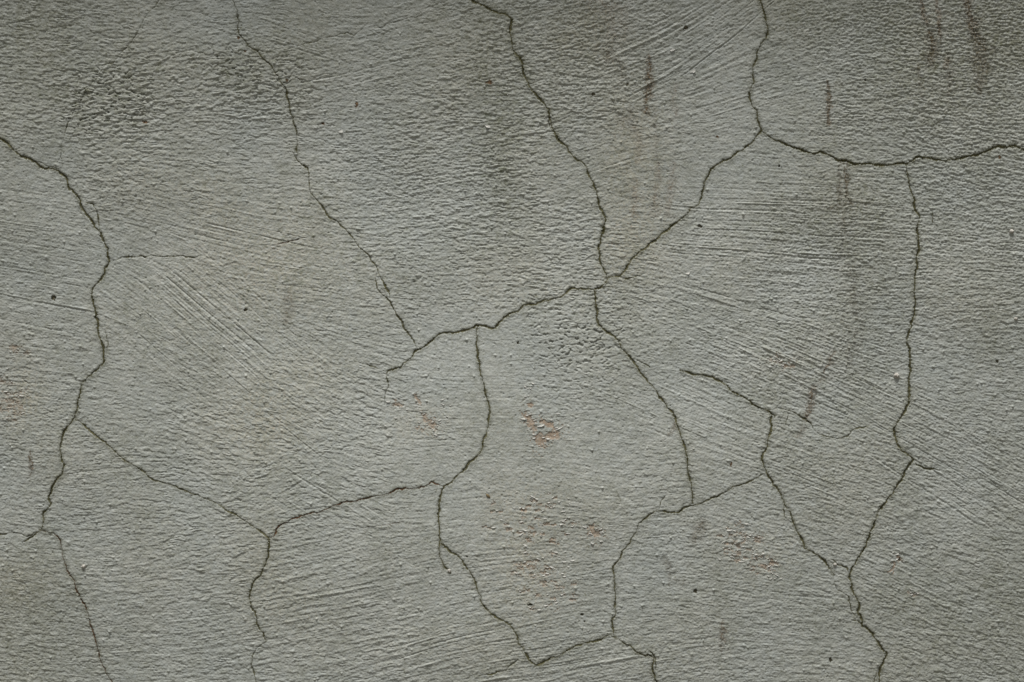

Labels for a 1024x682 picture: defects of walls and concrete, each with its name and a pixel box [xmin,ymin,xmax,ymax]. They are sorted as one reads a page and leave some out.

crack [0,138,372,682]
crack [234,0,1024,682]